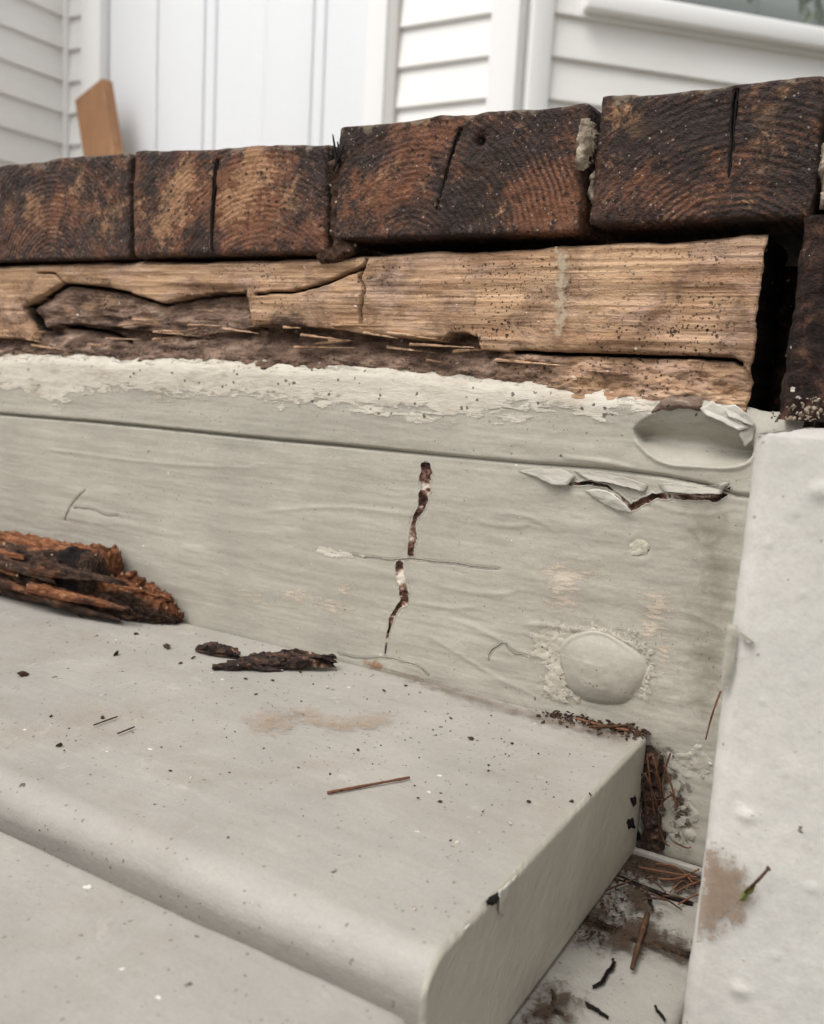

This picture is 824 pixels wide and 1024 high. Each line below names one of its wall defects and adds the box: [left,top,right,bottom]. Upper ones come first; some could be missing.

peeling [0,353,756,447]
crack [0,412,737,676]
damp [649,743,691,838]